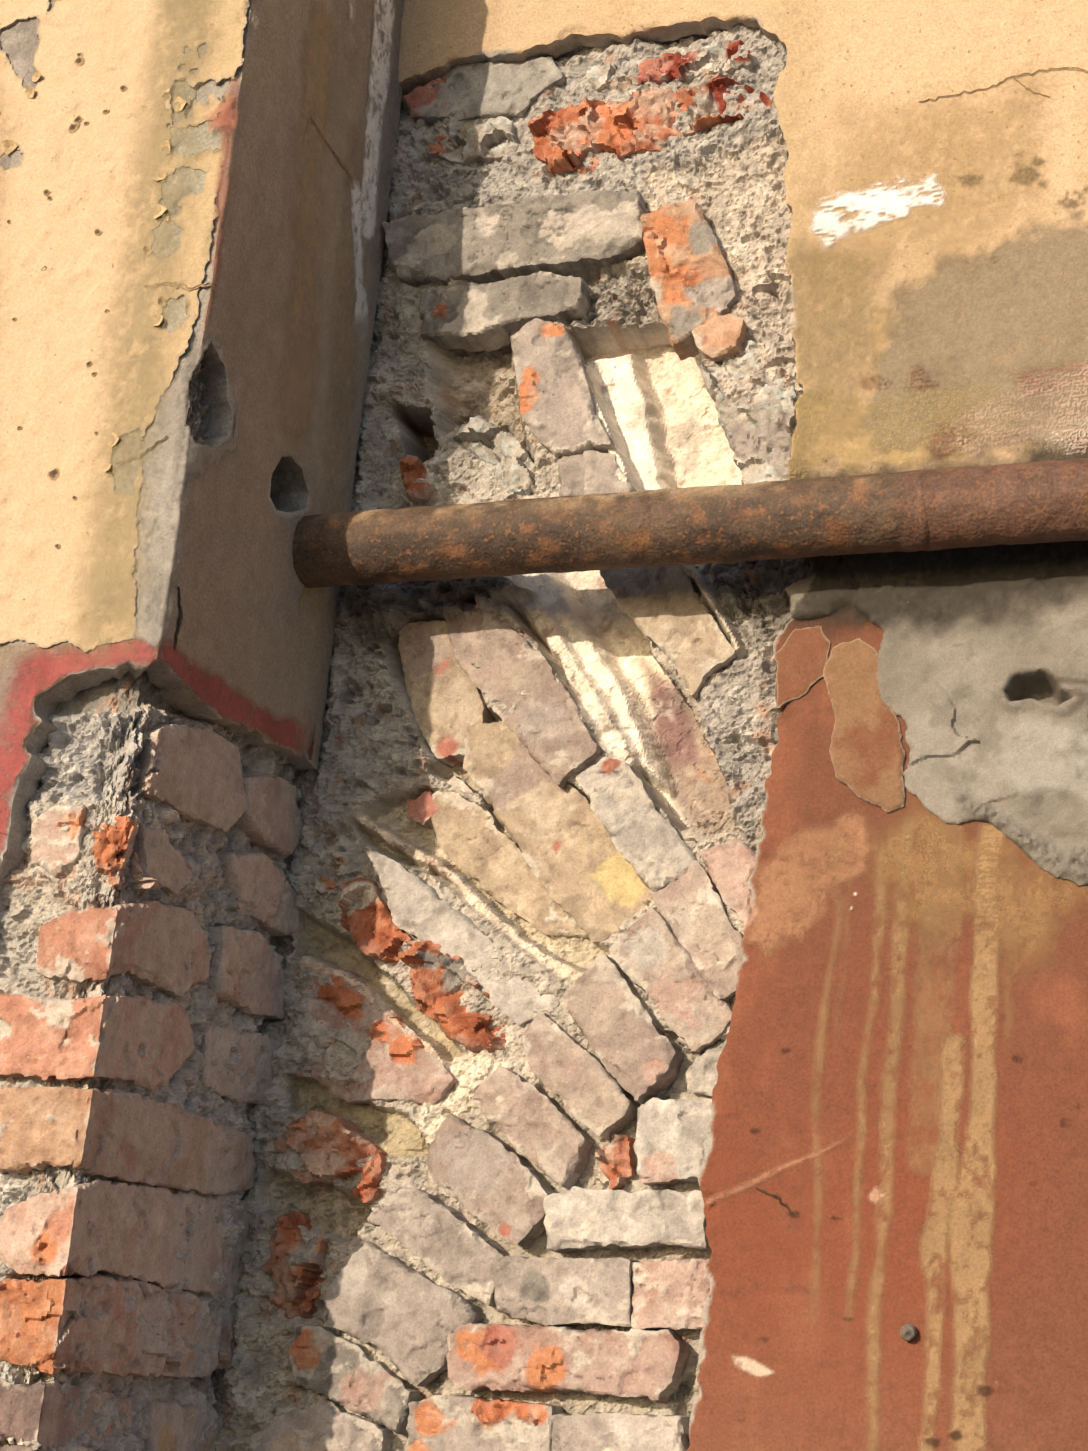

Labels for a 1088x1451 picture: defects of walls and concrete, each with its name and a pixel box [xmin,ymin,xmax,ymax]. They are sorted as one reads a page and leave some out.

peeling [0,139,23,170]
peeling [0,0,56,98]
peeling [62,107,110,133]
crack [919,67,1088,103]
peeling [94,71,239,646]
flaking render [350,23,804,512]
damp [787,213,1088,450]
peeling [47,467,60,482]
flaking render [0,557,906,1451]
damp [879,814,1088,1451]
damp [869,1267,881,1439]